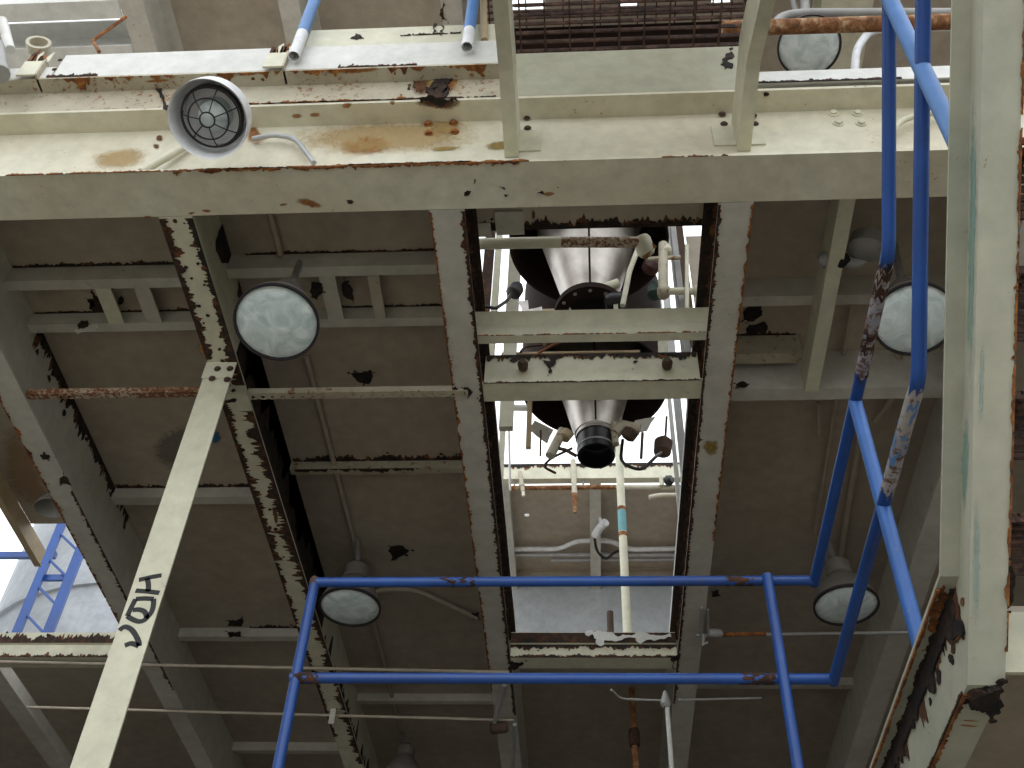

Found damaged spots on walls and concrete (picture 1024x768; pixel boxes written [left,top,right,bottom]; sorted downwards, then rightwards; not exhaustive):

corrosion [5,63,529,176]
corrosion [0,202,796,768]
peeling [585,630,671,646]
corrosion [1004,29,1024,652]